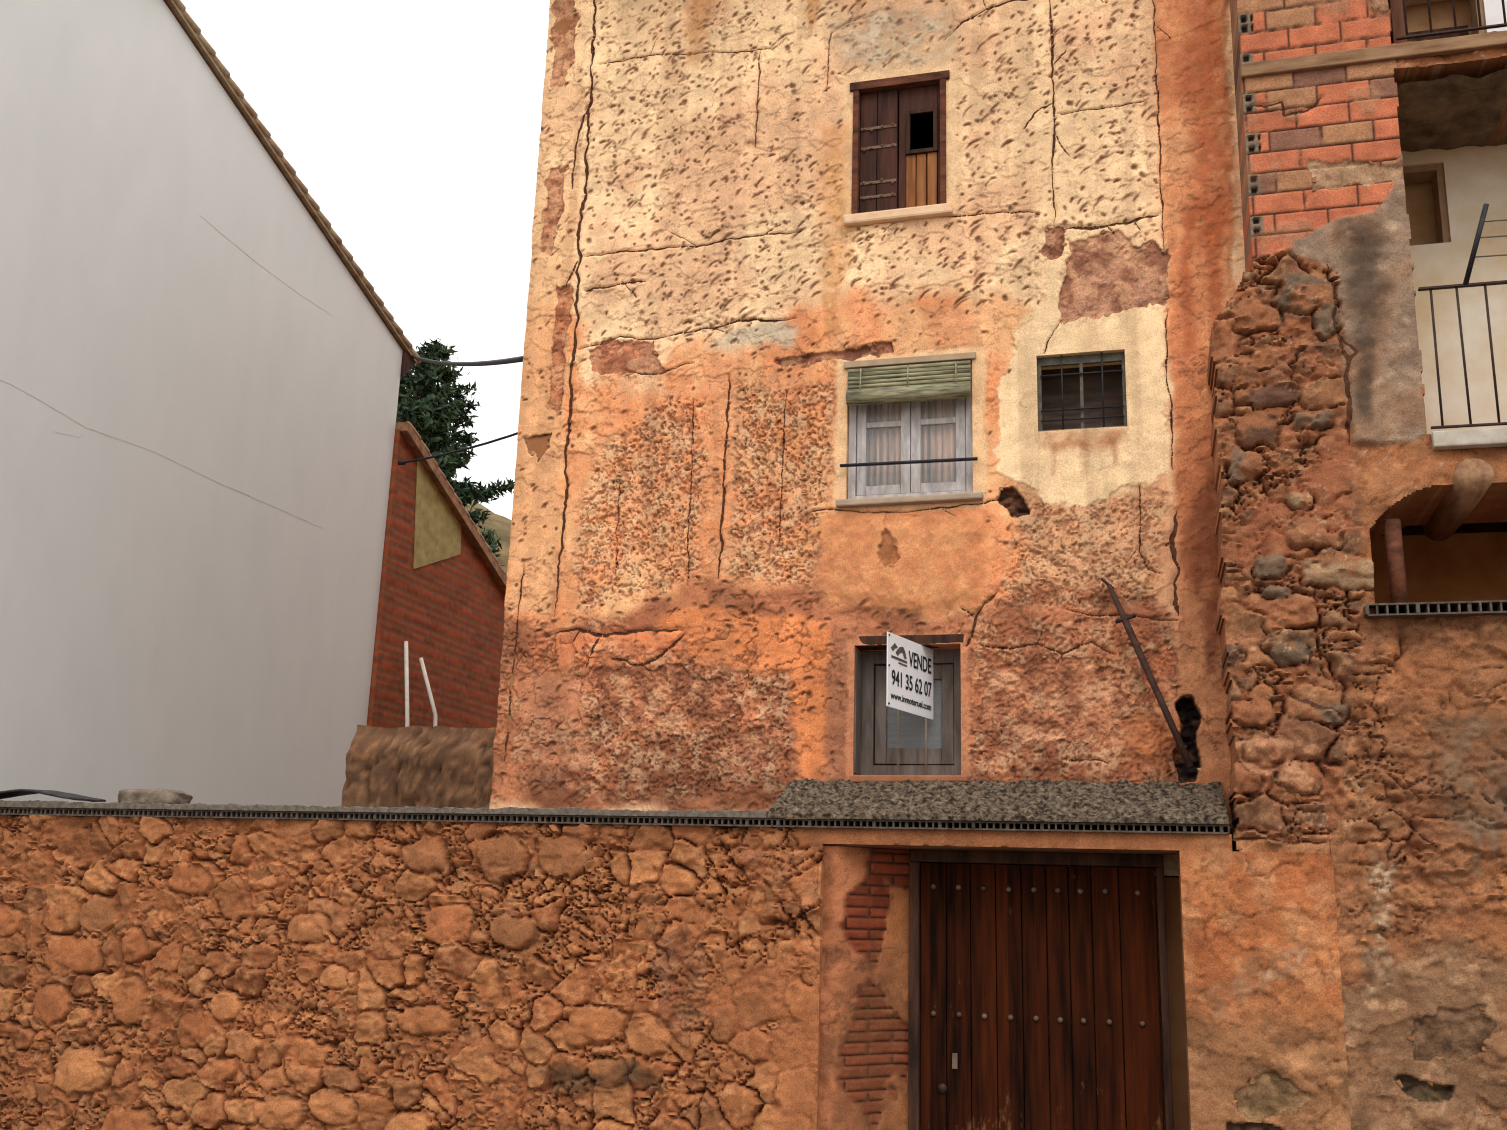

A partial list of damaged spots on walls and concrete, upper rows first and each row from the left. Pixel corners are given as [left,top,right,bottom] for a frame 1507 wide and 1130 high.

spalling [1370,0,1389,12]
crack [826,16,864,91]
spalling [1307,159,1403,191]
spalling [1042,226,1171,324]
crack [504,0,795,761]
spalling [774,342,894,368]
crack [1165,311,1173,469]
spalling [996,487,1030,518]
crack [961,486,1180,670]
spalling [1394,1004,1496,1102]
spalling [1227,1072,1312,1130]